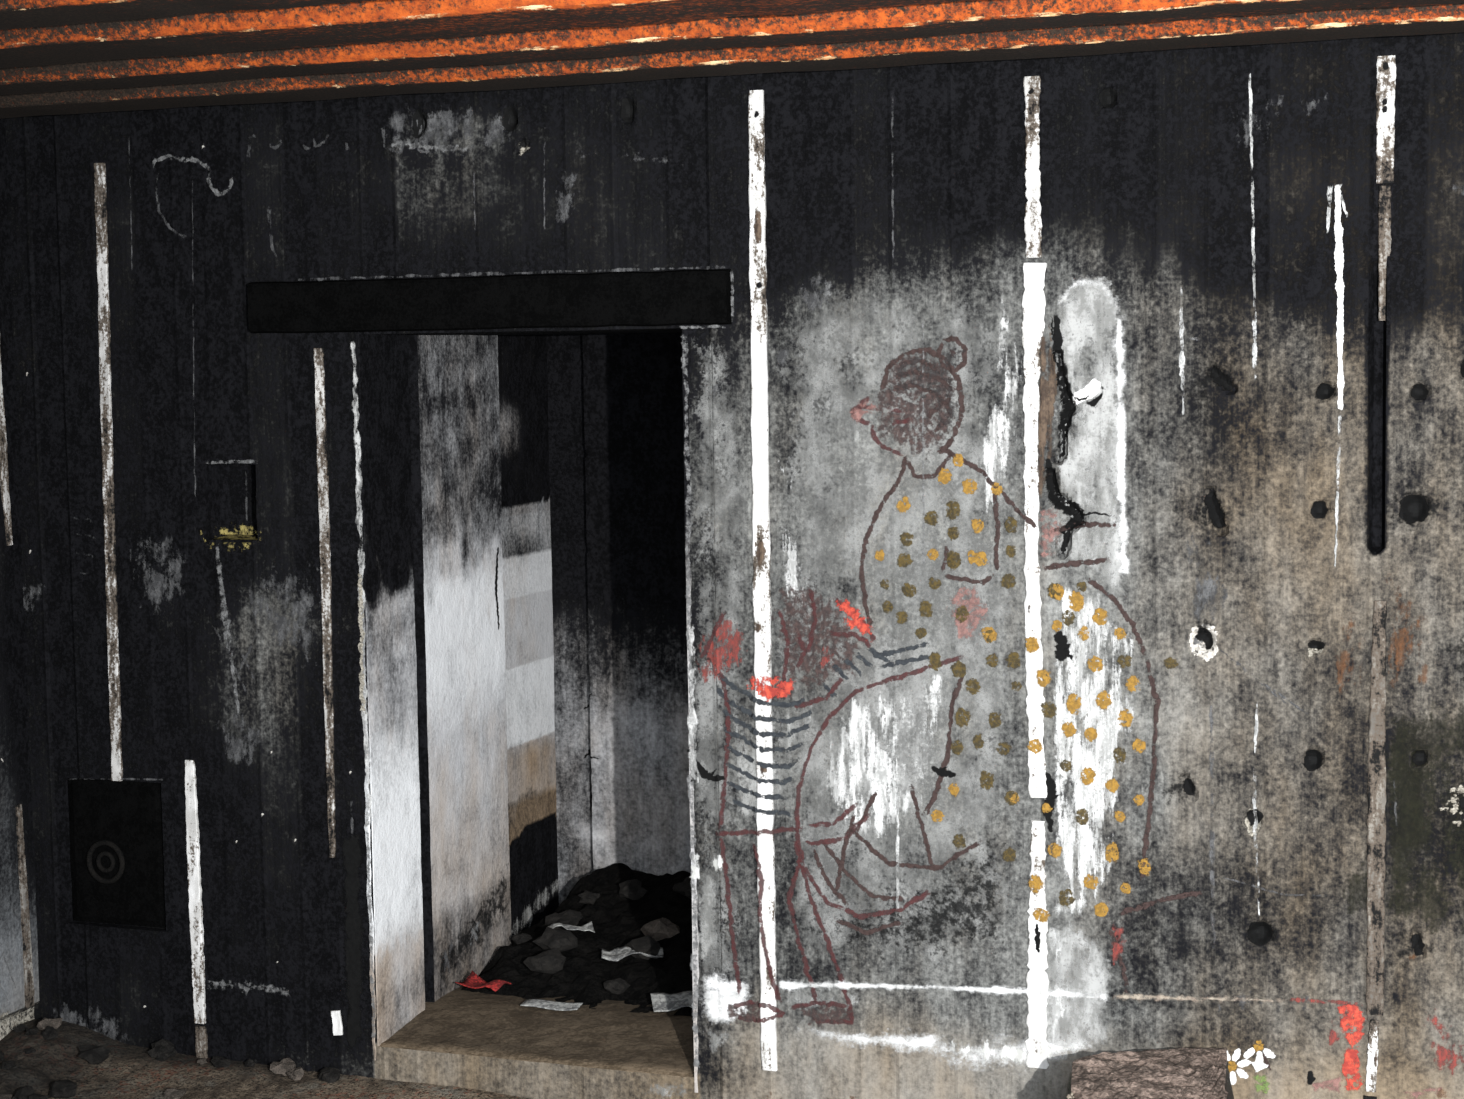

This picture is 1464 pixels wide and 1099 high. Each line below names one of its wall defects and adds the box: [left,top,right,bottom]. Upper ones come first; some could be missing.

crack [1040,316,1109,557]
spalling [1187,620,1219,662]